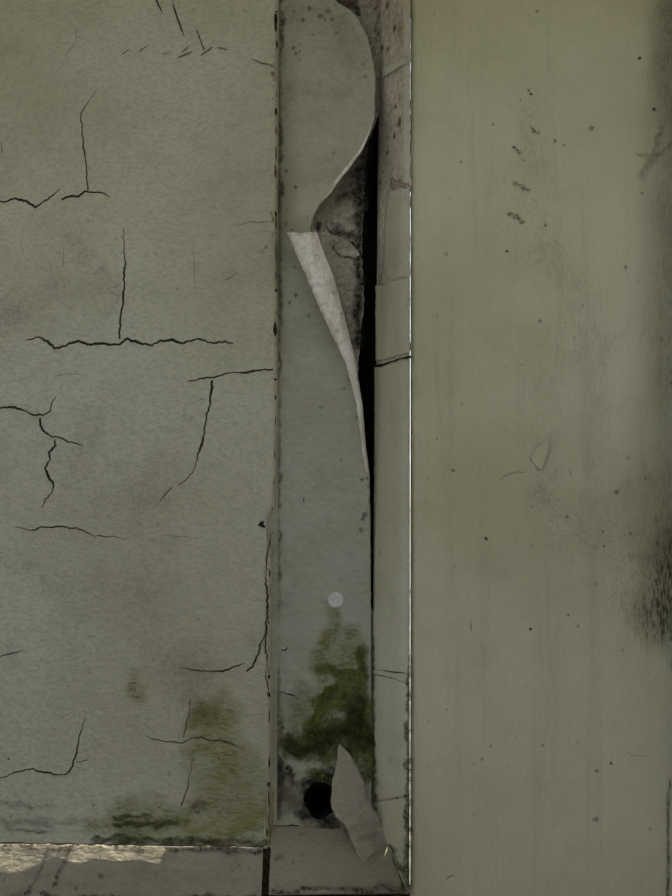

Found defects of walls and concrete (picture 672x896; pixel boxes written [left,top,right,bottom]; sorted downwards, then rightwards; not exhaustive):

crack [156,0,204,50]
crack [0,89,111,212]
crack [0,228,274,542]
peeling [258,0,411,891]
crack [179,527,297,699]
damp [644,536,672,643]
crack [0,713,89,782]
crack [147,698,243,806]
damp [277,721,339,829]